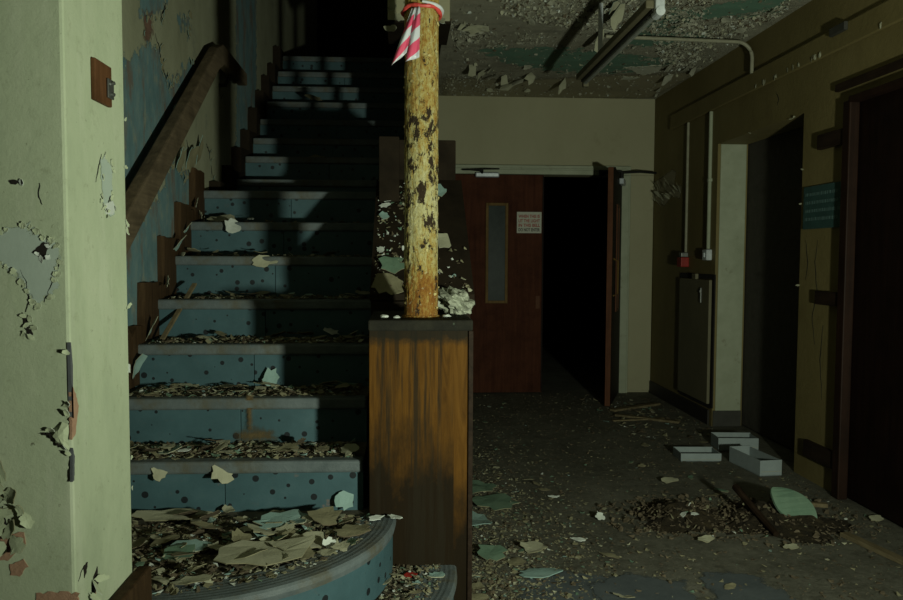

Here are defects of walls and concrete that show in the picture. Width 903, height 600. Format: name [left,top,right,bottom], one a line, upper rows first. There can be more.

peeling [456,0,788,97]
peeling [96,0,198,218]
peeling [0,221,64,340]
peeling [355,246,412,304]
peeling [426,227,451,252]
spalling [62,342,79,482]
spalling [0,461,35,577]